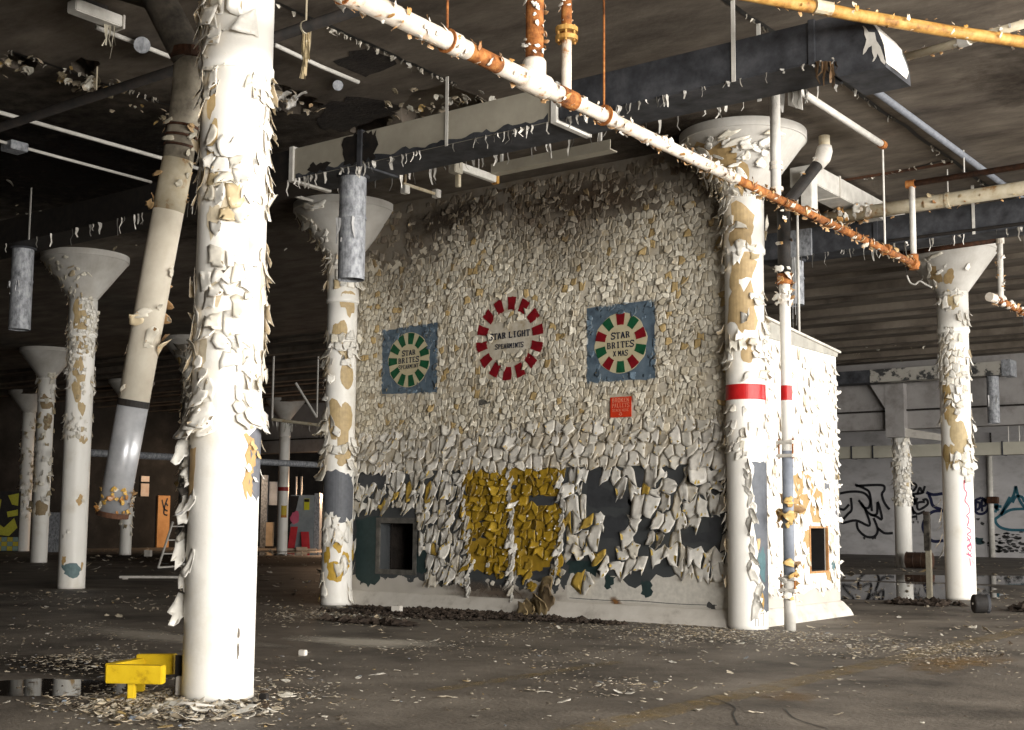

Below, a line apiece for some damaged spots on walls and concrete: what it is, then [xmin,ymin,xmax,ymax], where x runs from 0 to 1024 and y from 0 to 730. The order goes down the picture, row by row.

peeling [16,255,100,518]
peeling [61,556,83,578]
peeling [76,482,138,536]
peeling [128,0,496,626]
peeling [295,83,979,621]